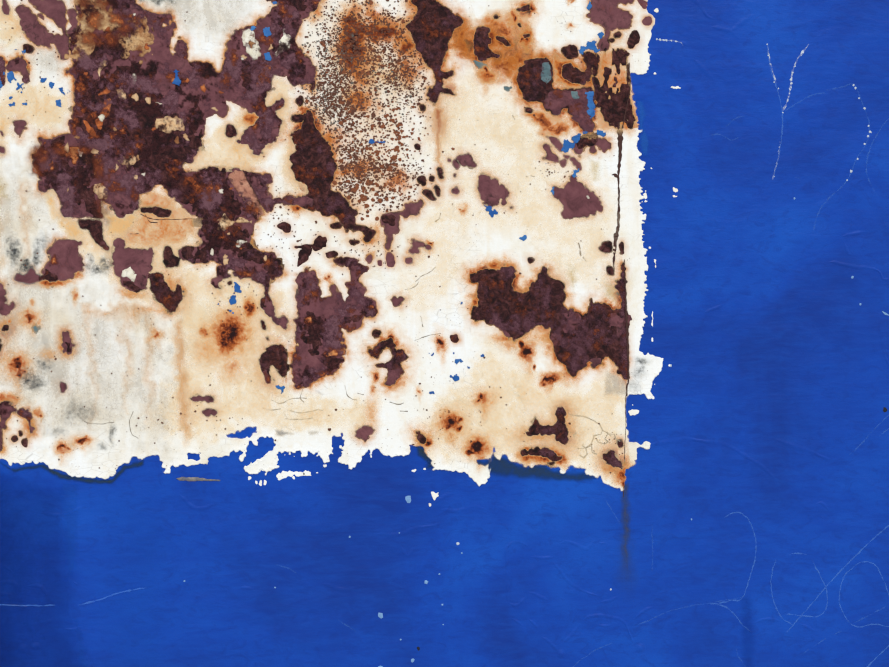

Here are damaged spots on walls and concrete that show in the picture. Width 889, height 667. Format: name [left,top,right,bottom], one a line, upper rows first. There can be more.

corrosion [0,393,43,452]
corrosion [0,0,640,437]
peeling [0,0,676,491]
corrosion [412,240,632,487]
crack [569,63,631,497]